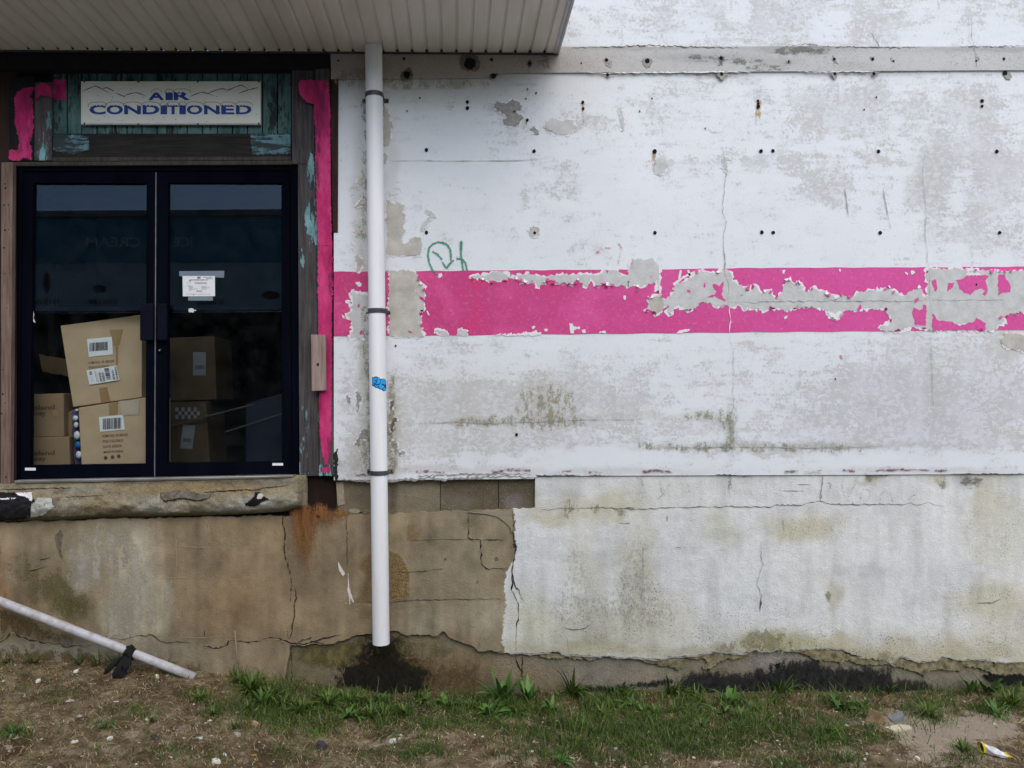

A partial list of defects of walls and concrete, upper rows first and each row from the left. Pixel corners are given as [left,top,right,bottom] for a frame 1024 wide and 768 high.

peeling [492,98,577,137]
peeling [342,253,369,343]
peeling [384,199,468,339]
peeling [527,225,541,239]
peeling [468,257,1024,354]
crack [0,485,337,673]
corrosion [290,504,349,567]
crack [365,512,523,680]
crack [543,480,941,511]
damp [334,632,482,694]